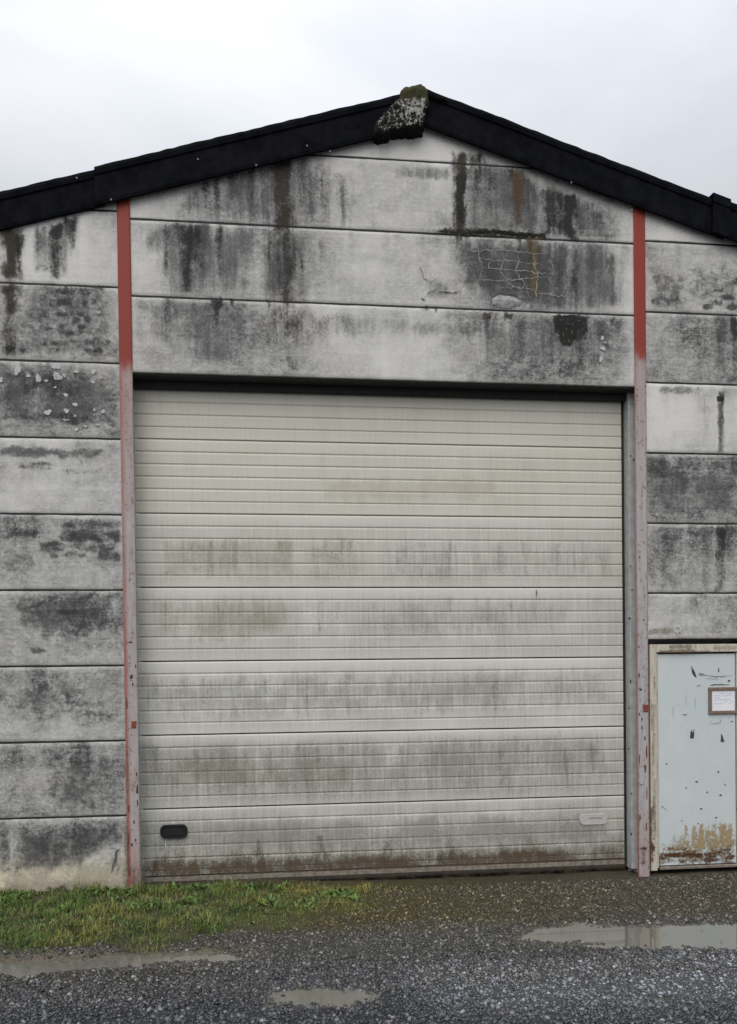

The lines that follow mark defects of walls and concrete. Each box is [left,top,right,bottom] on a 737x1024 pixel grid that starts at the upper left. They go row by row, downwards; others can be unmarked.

leakage [1,216,109,355]
leakage [149,224,253,290]
leakage [188,161,312,329]
crack [420,239,569,301]
leakage [427,152,614,307]
leakage [195,297,238,357]
peeling [0,362,105,432]
rust [639,791,736,865]